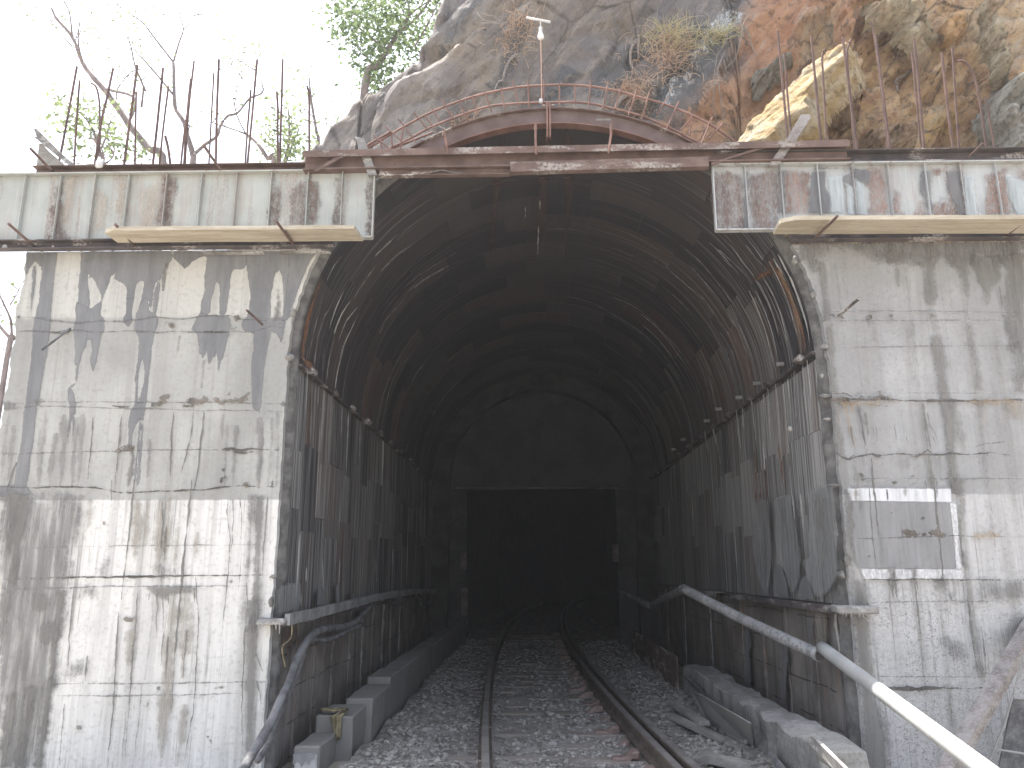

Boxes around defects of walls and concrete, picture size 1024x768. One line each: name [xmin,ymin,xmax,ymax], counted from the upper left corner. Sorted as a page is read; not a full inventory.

corrosion [48,182,71,239]
corrosion [156,177,177,226]
corrosion [269,181,321,225]
corrosion [366,183,375,235]
corrosion [711,171,810,229]
corrosion [866,168,954,215]
corrosion [985,169,1008,215]
leakage [800,241,1024,454]
crack [836,442,1010,479]
leakage [922,326,965,600]
leakage [0,251,315,768]